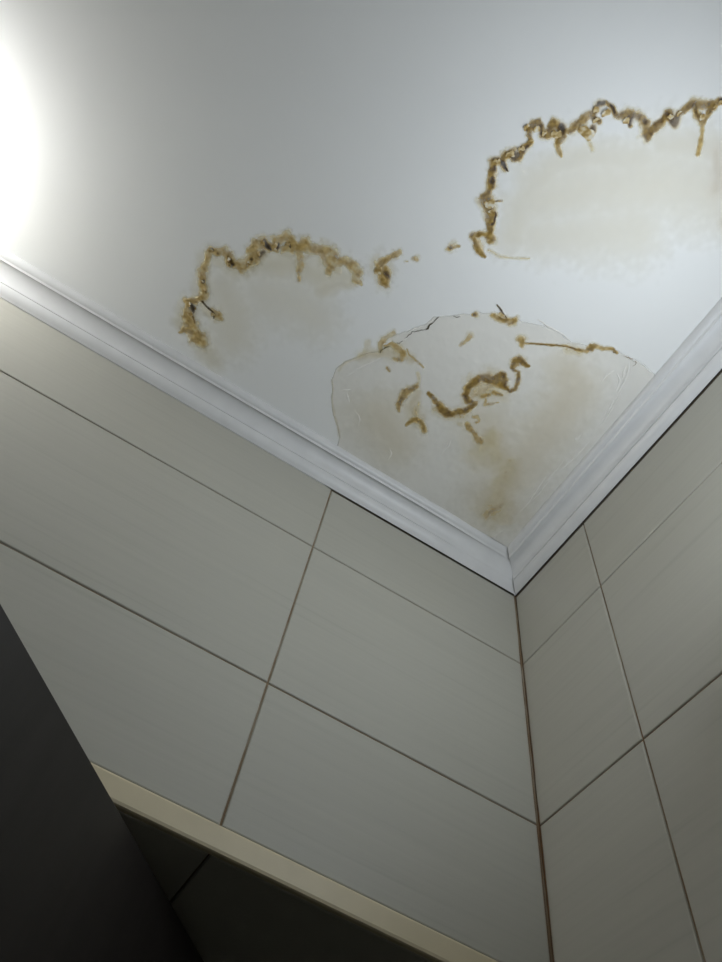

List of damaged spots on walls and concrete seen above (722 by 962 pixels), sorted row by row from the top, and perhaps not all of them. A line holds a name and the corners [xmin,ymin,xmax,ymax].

damp [470,98,722,258]
damp [179,231,401,347]
damp [490,305,518,325]
damp [396,336,530,444]